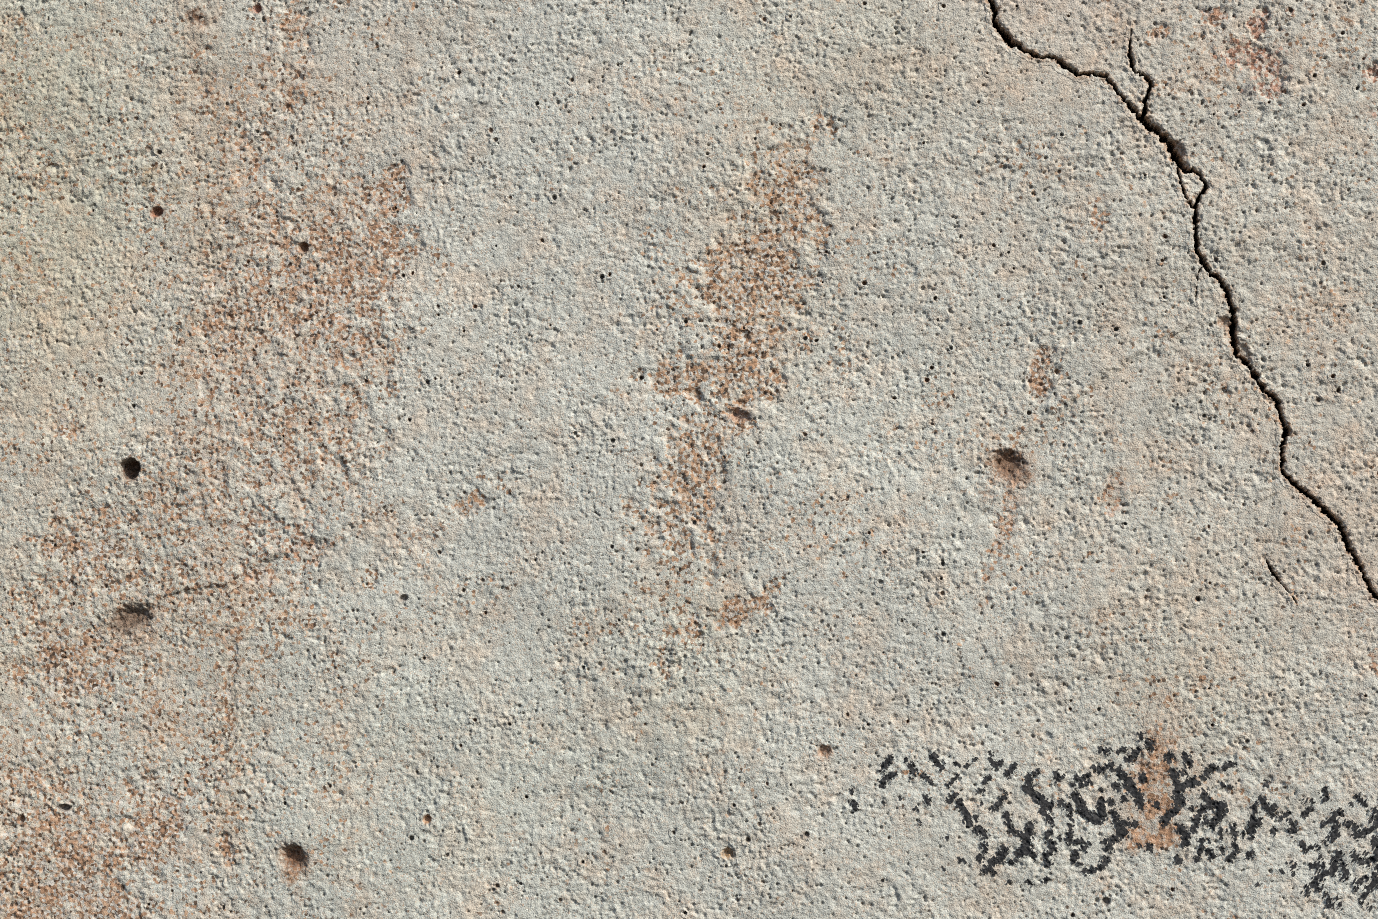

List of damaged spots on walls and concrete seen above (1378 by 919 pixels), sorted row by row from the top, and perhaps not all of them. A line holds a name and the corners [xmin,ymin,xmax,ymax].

crack [981,0,1378,613]